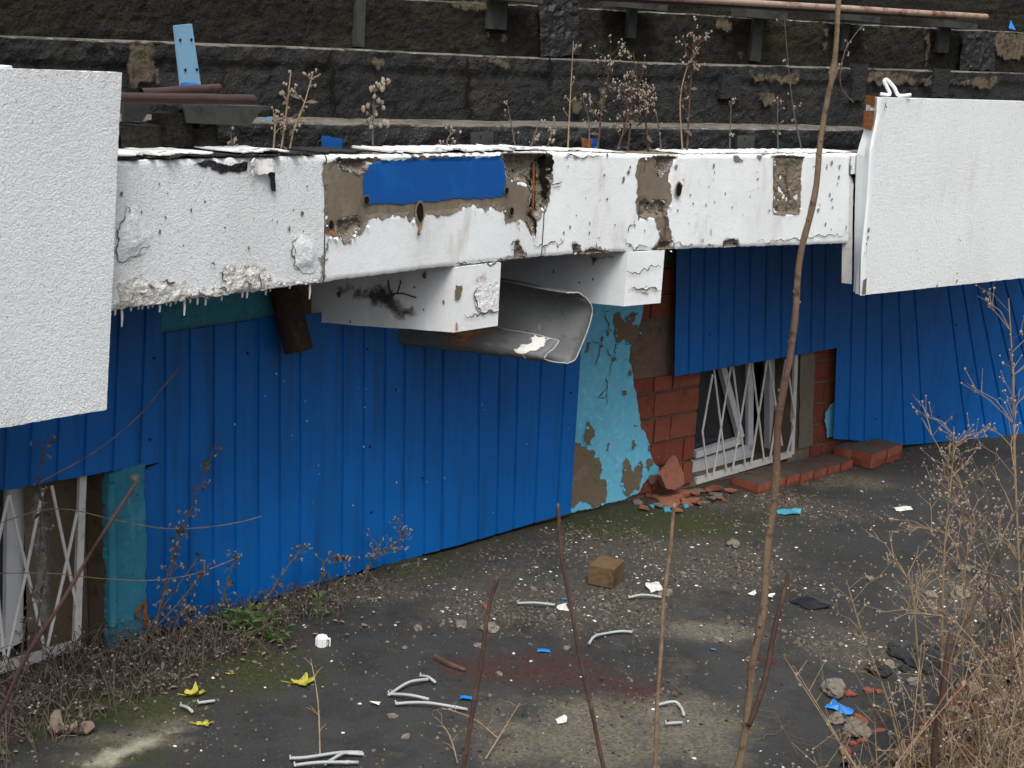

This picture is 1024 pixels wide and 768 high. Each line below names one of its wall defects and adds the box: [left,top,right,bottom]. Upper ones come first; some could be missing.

peeling [195,160,248,174]
peeling [322,153,554,259]
peeling [622,154,726,252]
peeling [734,155,841,215]
crack [596,205,714,293]
spalling [114,253,319,327]
peeling [585,312,641,353]
peeling [571,421,610,508]
peeling [621,440,657,497]